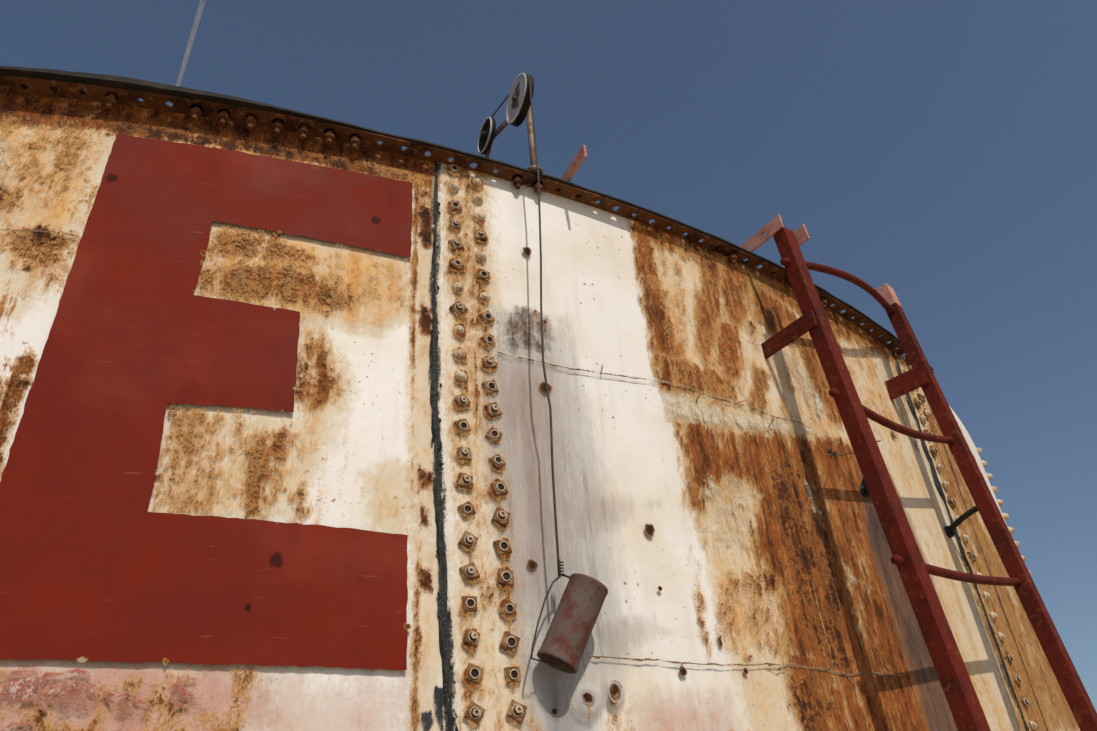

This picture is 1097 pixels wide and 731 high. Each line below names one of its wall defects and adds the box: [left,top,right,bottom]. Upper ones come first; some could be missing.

rust [0,92,544,731]
rust [627,218,929,731]
rust [824,307,1079,731]